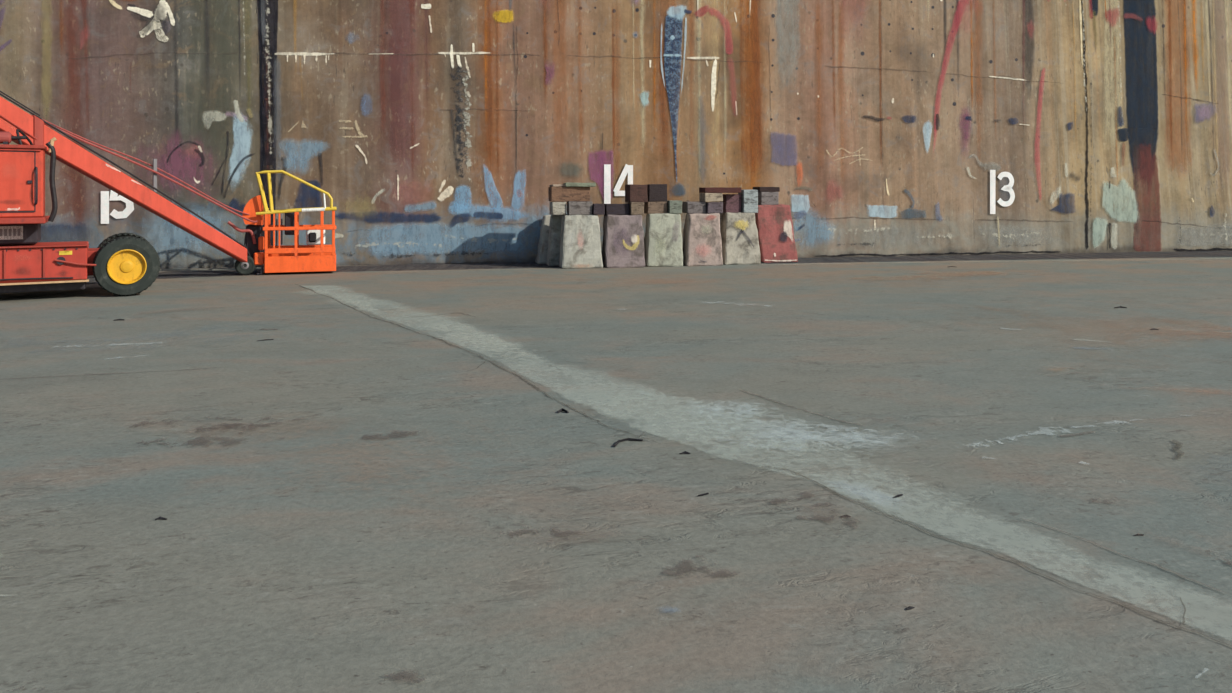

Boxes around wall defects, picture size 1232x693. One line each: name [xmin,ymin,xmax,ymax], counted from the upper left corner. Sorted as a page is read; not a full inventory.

corrosion [741,0,761,169]